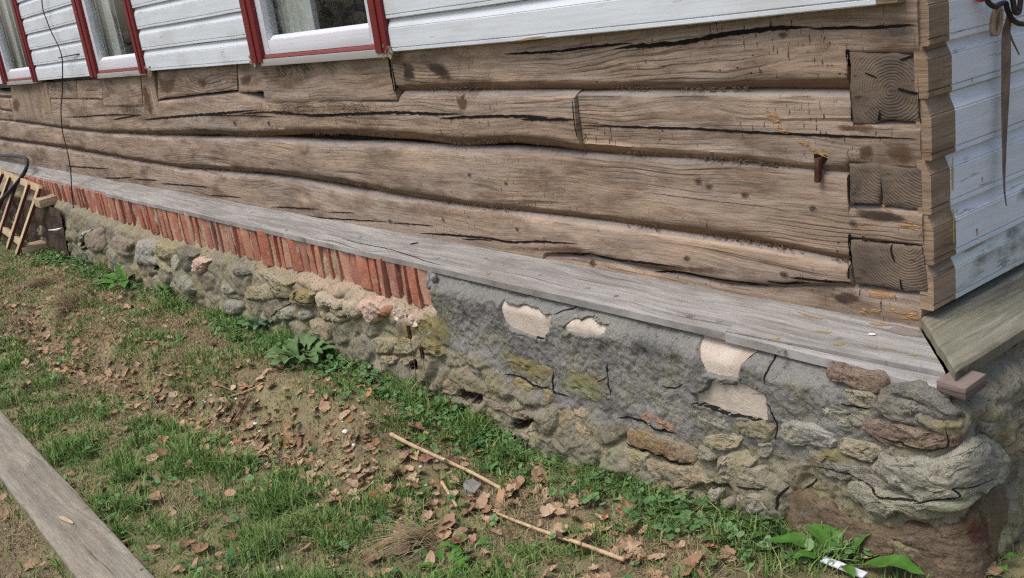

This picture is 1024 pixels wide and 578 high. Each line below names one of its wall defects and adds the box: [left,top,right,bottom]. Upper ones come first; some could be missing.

crack [508,24,914,54]
crack [865,73,918,95]
crack [71,110,912,139]
crack [68,166,241,198]
crack [277,206,851,286]
spalling [502,294,552,339]
spalling [565,312,610,335]
crack [506,373,567,396]
spalling [692,335,773,420]
crack [663,384,778,439]
crack [712,465,998,510]